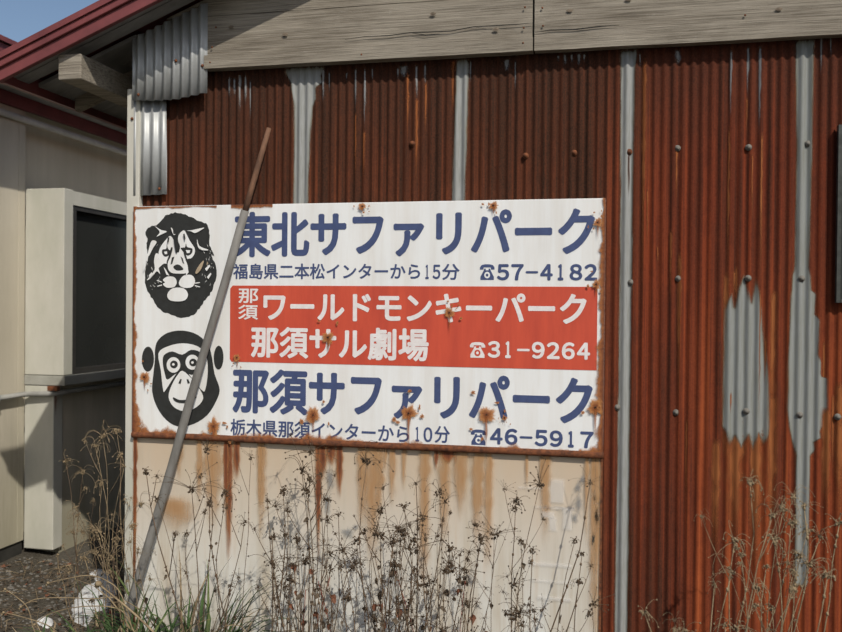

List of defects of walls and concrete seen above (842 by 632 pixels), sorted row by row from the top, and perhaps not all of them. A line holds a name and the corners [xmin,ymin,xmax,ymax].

rust [407,74,427,163]
rust [752,137,763,235]
rust [199,417,228,437]
rust [223,434,274,546]
rust [288,400,363,533]
rust [392,404,458,465]
rust [479,402,511,441]
rust [539,449,551,514]
rust [579,198,606,452]
rust [712,292,777,538]
peeling [722,276,769,447]
rust [821,385,842,501]